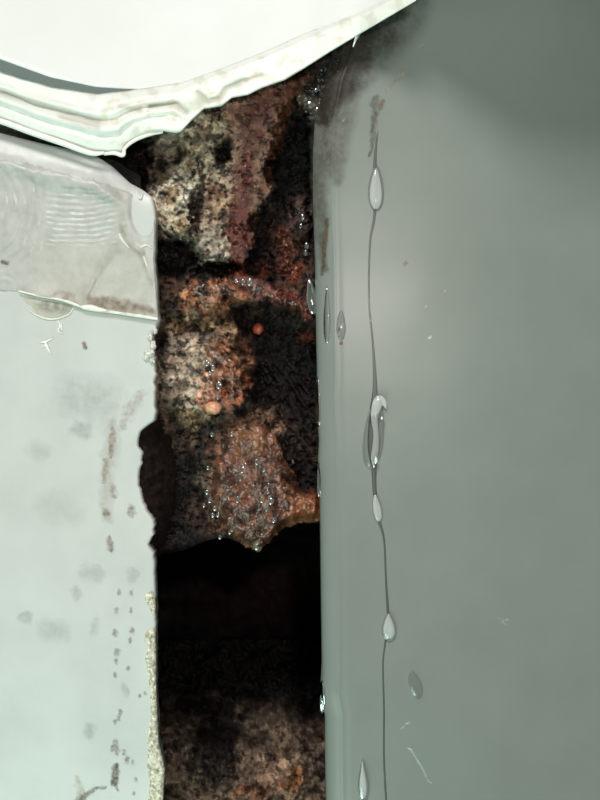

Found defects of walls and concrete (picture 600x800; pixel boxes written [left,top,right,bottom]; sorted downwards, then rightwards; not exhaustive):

water stain [316,4,411,145]
rust [230,84,315,318]
spalling [0,59,321,557]
spalling [145,591,157,615]
spalling [144,628,166,800]